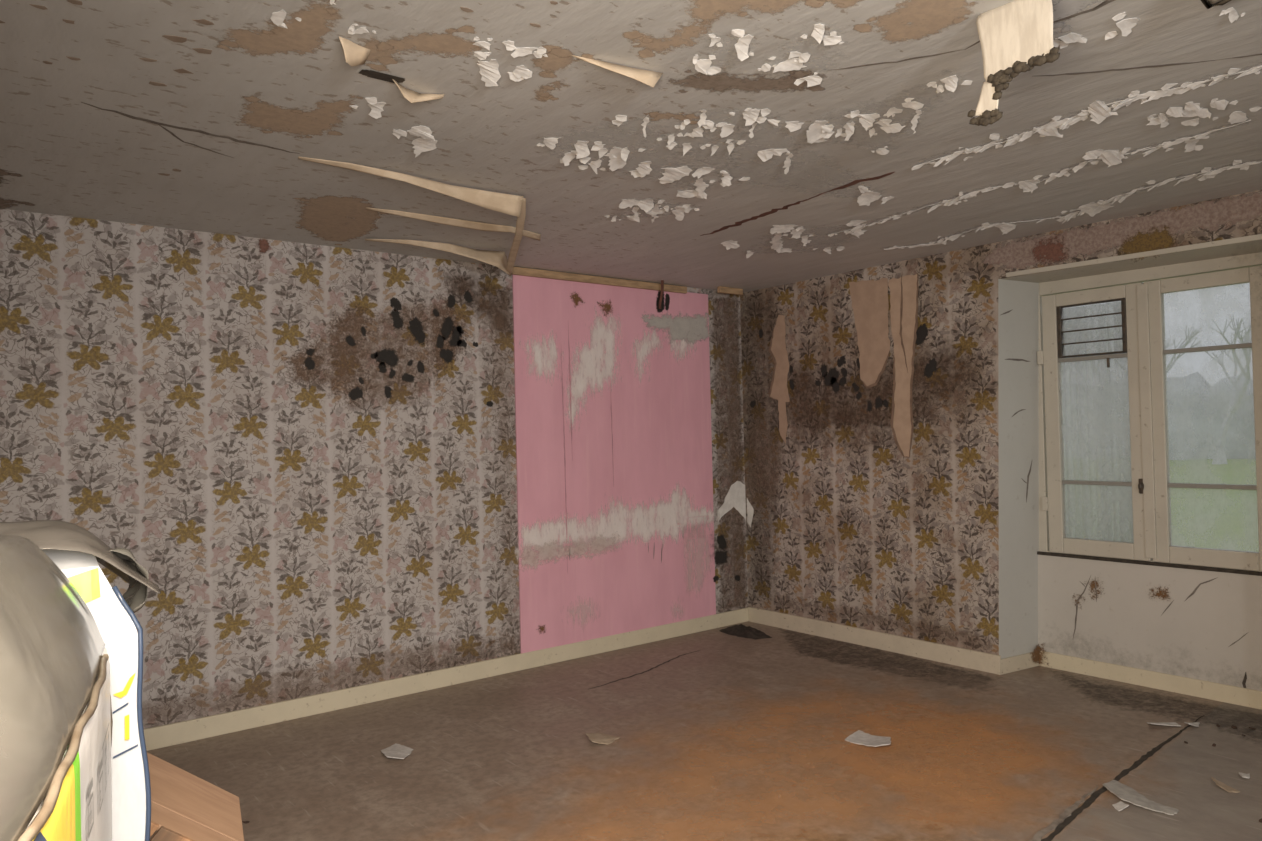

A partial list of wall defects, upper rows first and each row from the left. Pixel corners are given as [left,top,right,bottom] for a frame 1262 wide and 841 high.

peeling [162,0,594,102]
peeling [623,0,975,93]
peeling [1053,0,1097,49]
peeling [1105,12,1139,40]
peeling [236,95,386,138]
peeling [392,125,437,158]
peeling [537,98,924,223]
peeling [770,65,1262,254]
flaking render [884,160,1262,272]
damp [291,276,510,405]
damp [912,323,975,421]
damp [713,299,893,607]